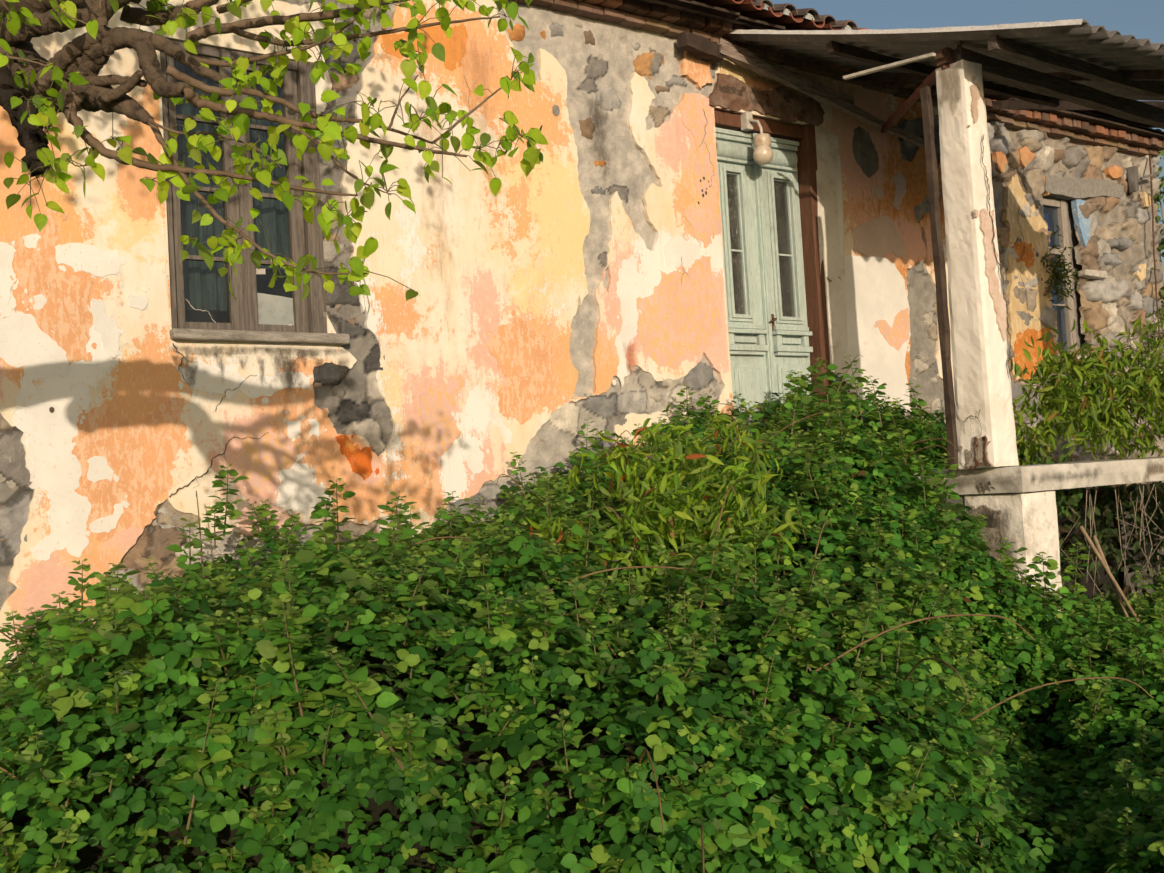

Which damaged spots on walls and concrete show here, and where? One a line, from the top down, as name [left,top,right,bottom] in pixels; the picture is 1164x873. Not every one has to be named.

crack [169,433,266,498]
flaking render [0,0,468,609]
damp [203,348,321,385]
flaking render [410,1,733,532]
peeling [845,115,945,432]
peeling [973,208,1007,342]